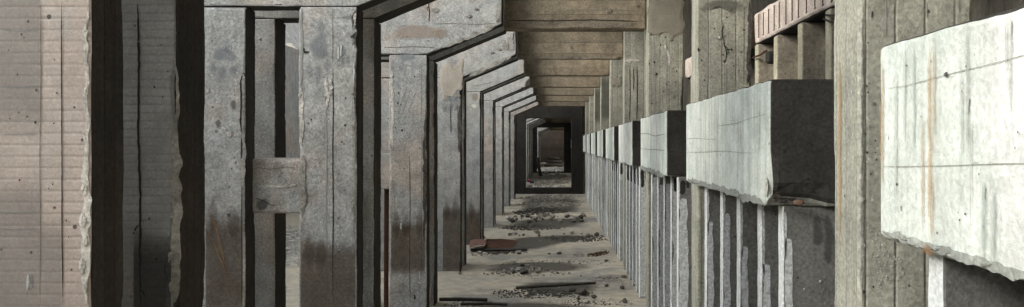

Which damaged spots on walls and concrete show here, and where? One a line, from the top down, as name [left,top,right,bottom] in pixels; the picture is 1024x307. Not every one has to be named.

spalling [65,5,92,304]
crack [134,4,142,250]
spalling [156,35,183,304]
crack [239,73,295,227]
crack [722,27,744,81]
spalling [860,9,1024,302]